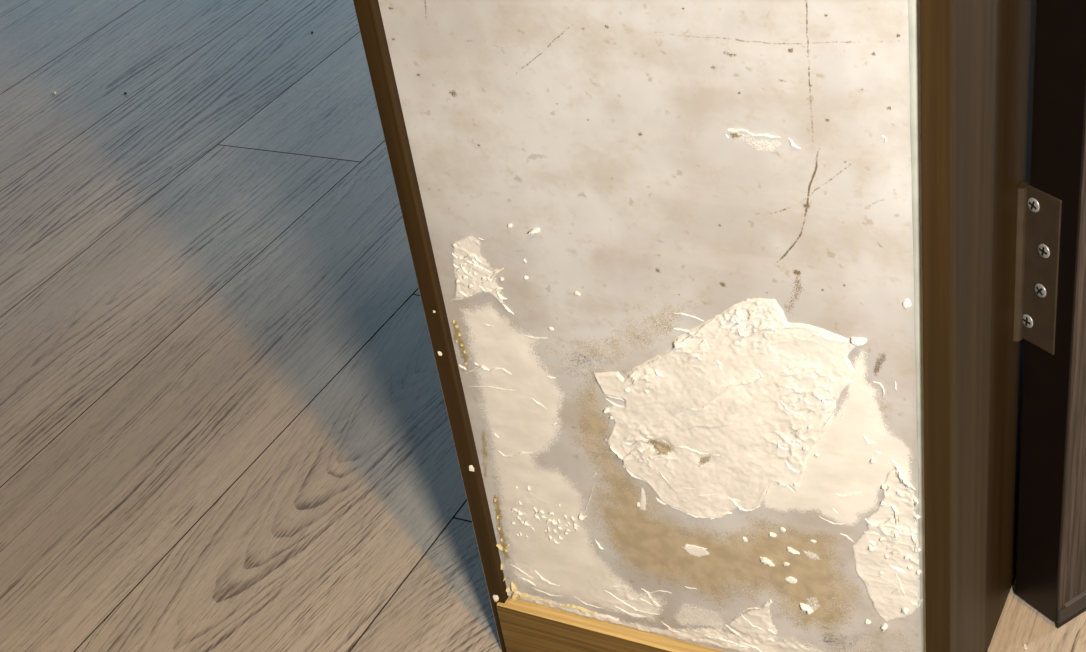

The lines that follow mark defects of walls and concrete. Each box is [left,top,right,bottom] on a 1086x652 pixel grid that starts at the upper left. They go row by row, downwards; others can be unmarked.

peeling [723,129,800,152]
crack [778,0,820,262]
flaking render [451,234,514,315]
flaking render [851,337,867,346]
spalling [645,439,673,456]
water stain [544,300,916,652]